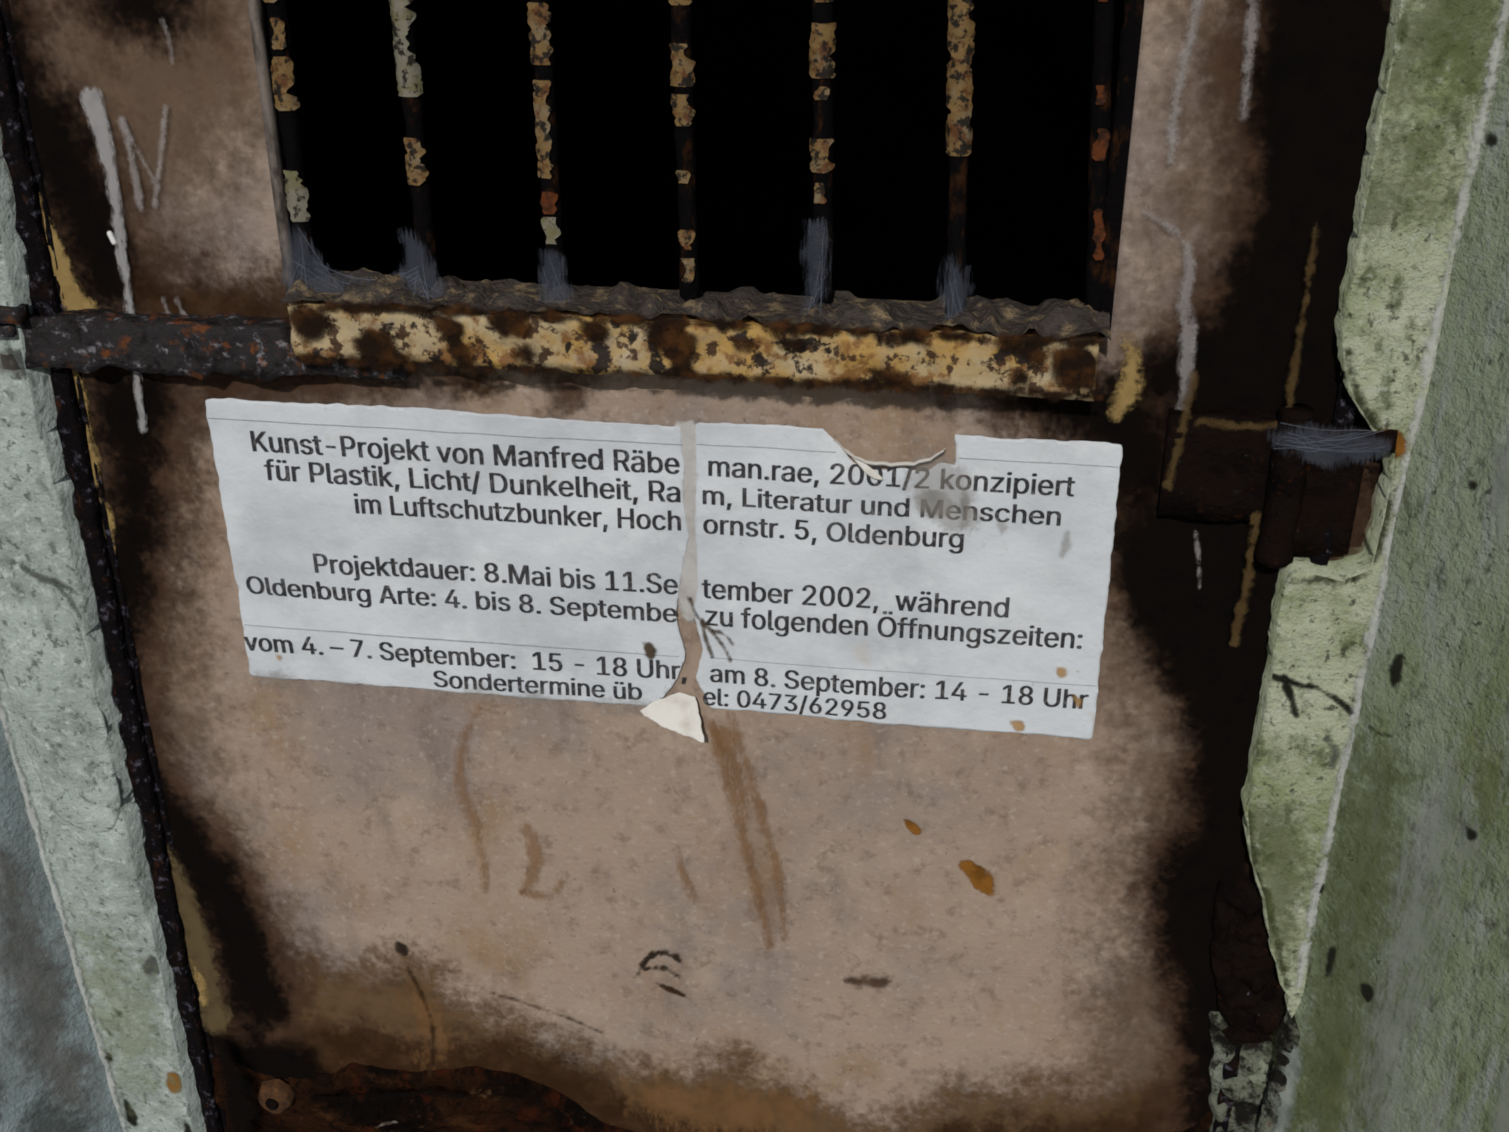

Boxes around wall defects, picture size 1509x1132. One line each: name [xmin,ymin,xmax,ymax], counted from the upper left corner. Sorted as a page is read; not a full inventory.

leakage [82,87,133,314]
leakage [134,371,145,431]
rust [25,0,264,286]
rust [109,301,1164,507]
leakage [1163,223,1196,410]
rust [1153,0,1255,352]
leakage [1243,13,1256,109]
rust [138,595,227,828]
rust [274,550,1201,1132]
spalling [1208,811,1300,1132]